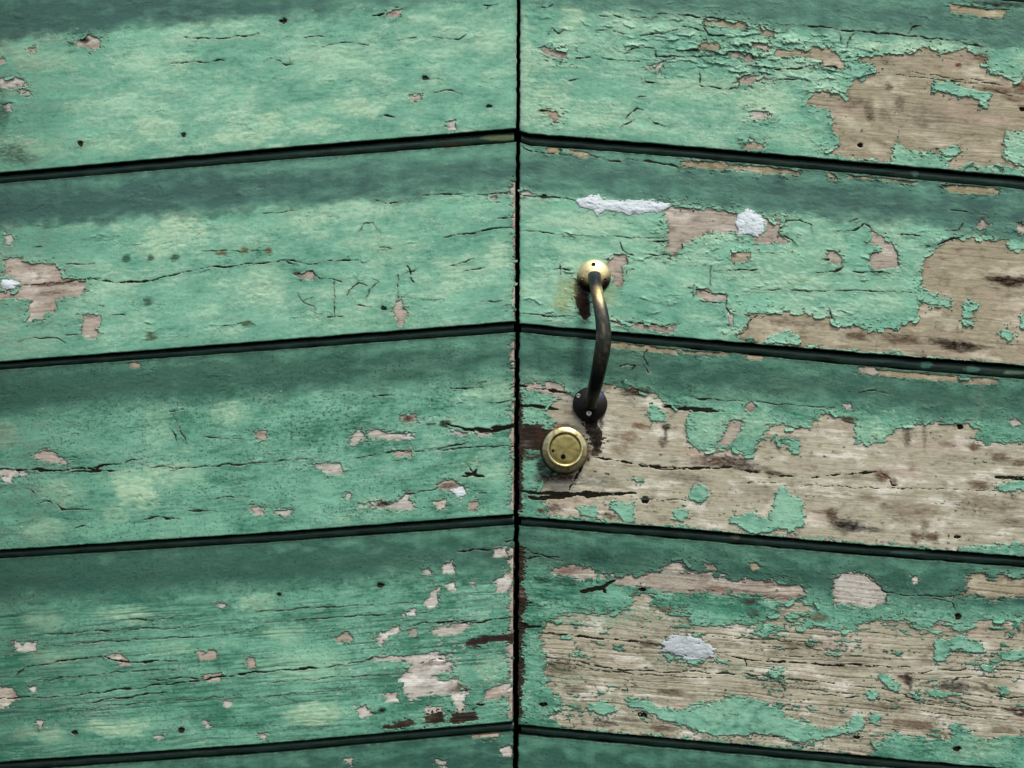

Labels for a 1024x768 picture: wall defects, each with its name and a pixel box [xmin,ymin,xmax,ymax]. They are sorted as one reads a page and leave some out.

crack [569,15,746,125]
peeling [698,11,1024,174]
peeling [0,232,92,328]
crack [24,247,415,318]
peeling [611,316,731,360]
peeling [659,196,793,265]
peeling [691,214,1024,365]
crack [0,459,284,528]
crack [370,385,567,494]
peeling [505,335,1024,551]
crack [0,618,444,709]
peeling [367,545,1024,759]